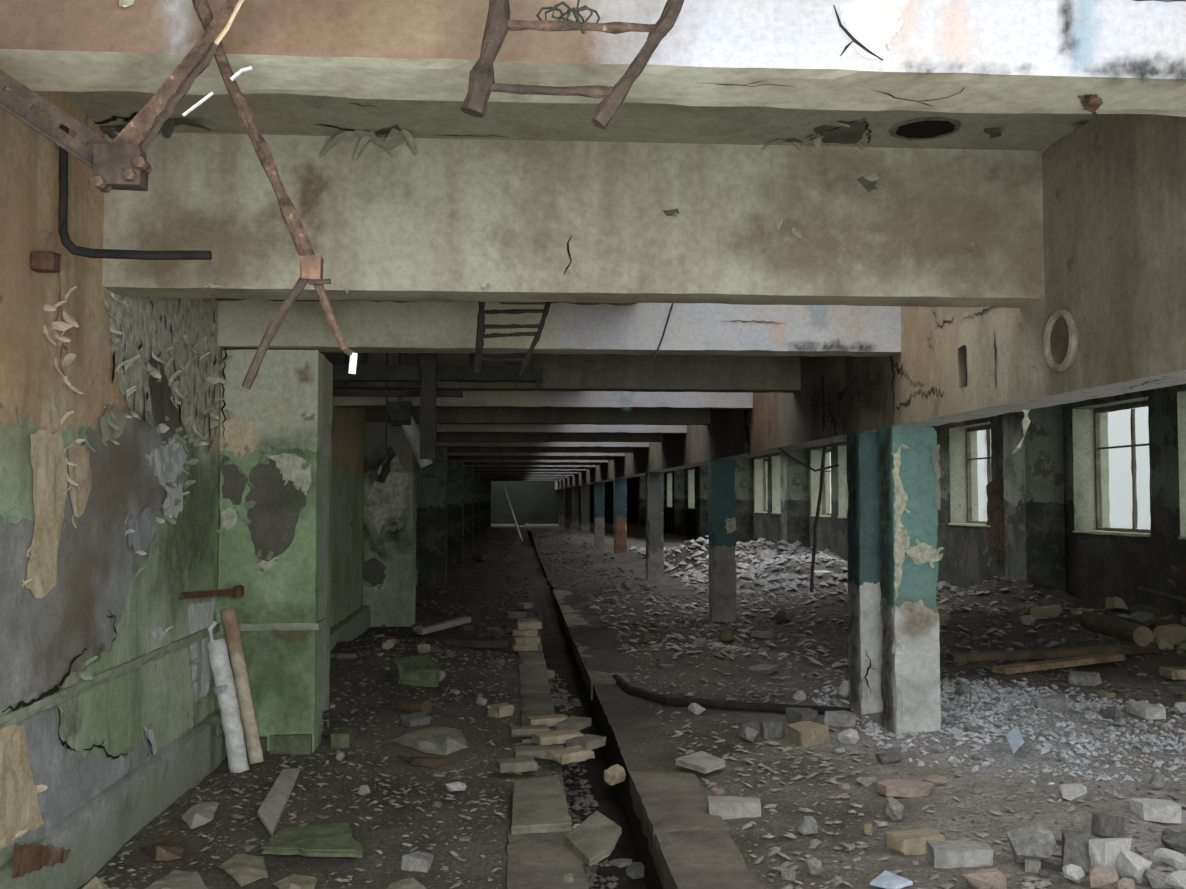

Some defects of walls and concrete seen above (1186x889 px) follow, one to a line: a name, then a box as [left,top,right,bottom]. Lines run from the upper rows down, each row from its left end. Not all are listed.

peeling [0,271,312,879]